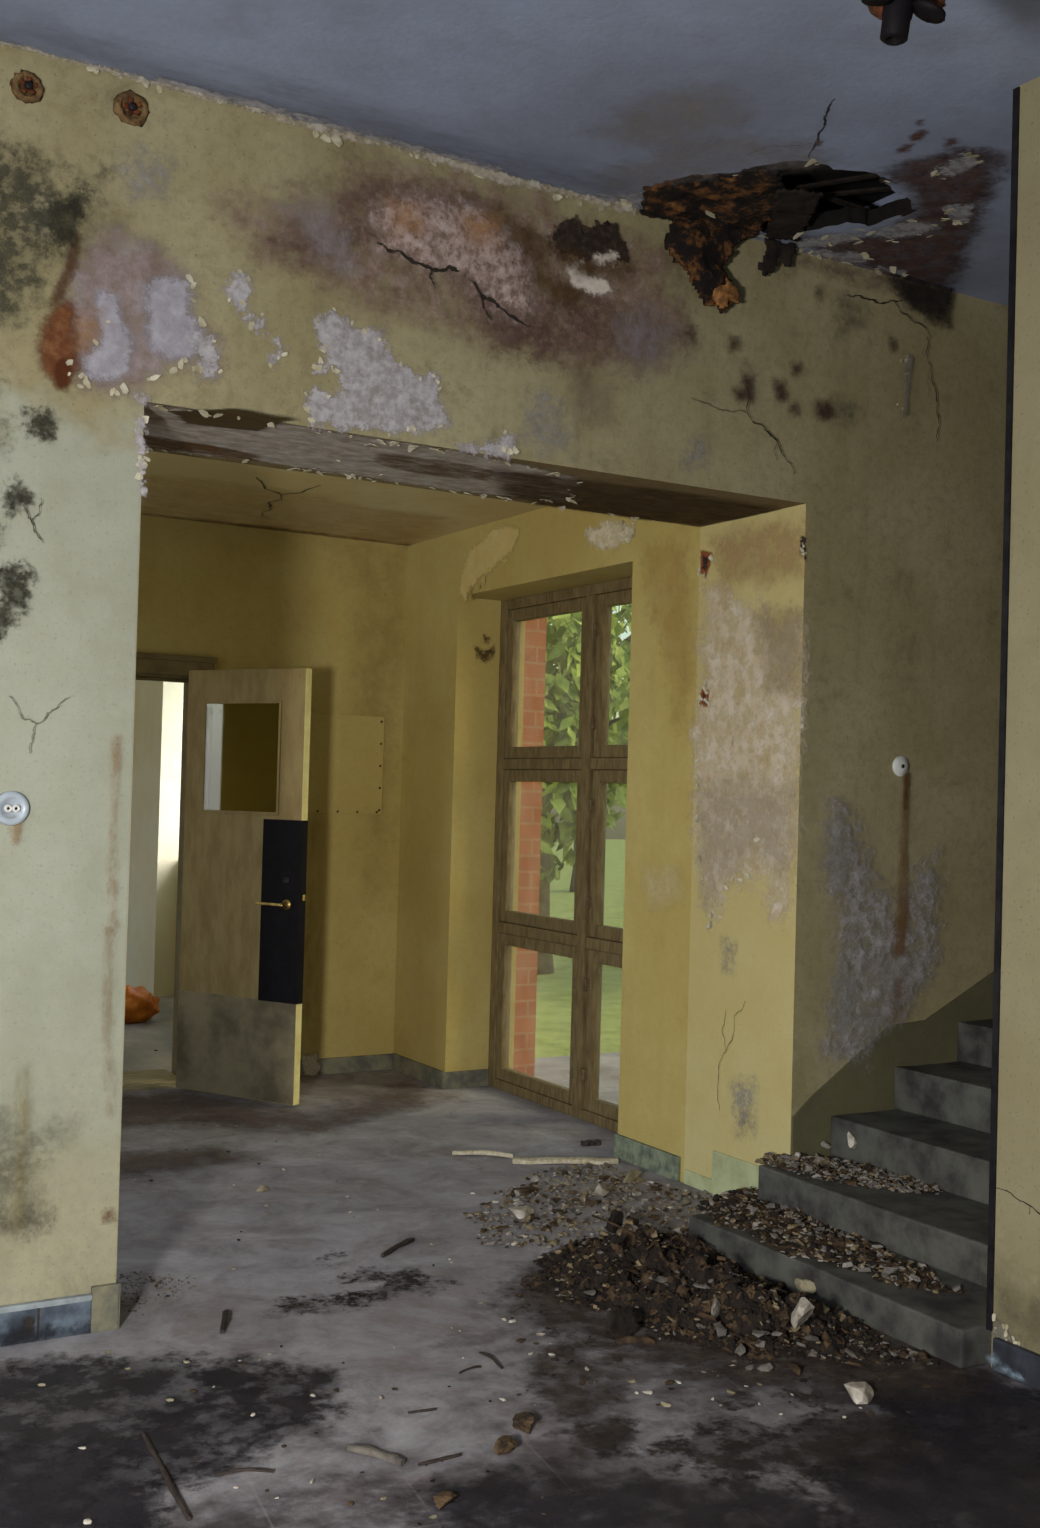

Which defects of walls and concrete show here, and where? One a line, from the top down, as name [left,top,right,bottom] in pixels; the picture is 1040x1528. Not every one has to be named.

leakage [2,481,32,518]
leakage [22,407,56,441]
leakage [0,144,93,319]
corrosion [38,236,80,388]
flaking render [0,42,645,296]
peeling [66,230,585,504]
crack [377,242,528,328]
crack [692,398,795,472]
leakage [0,561,37,640]
peeling [690,525,807,929]
corrosion [895,774,908,954]
crack [996,1188,1040,1214]